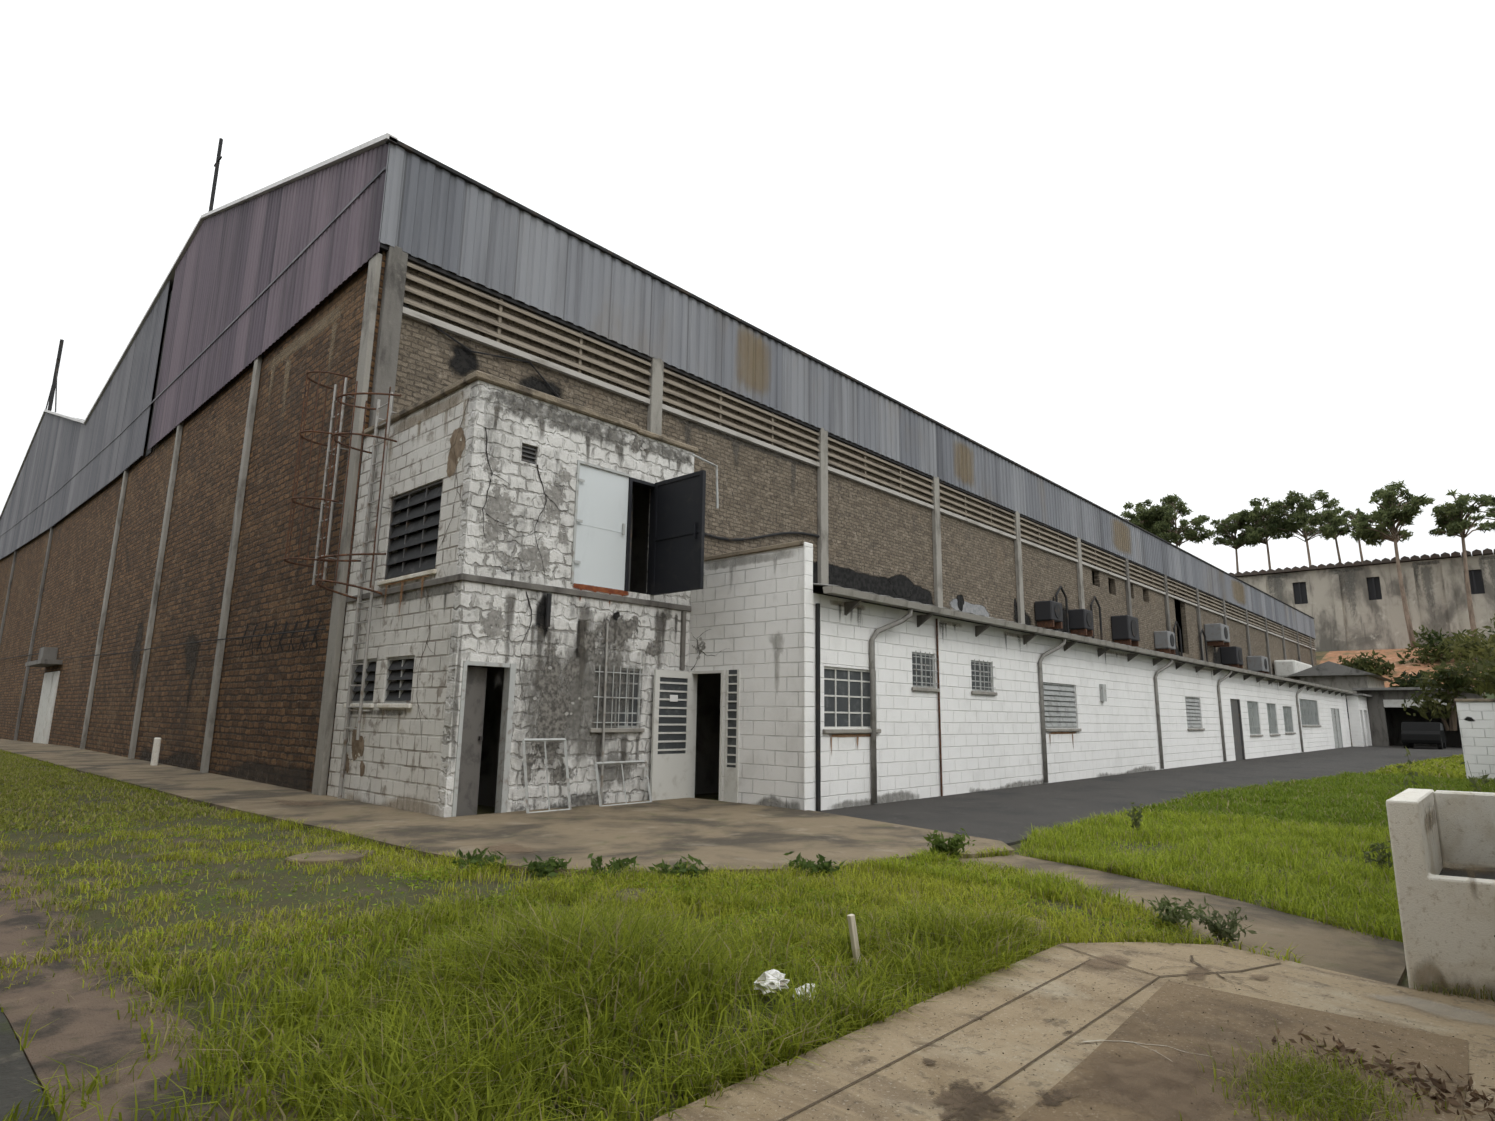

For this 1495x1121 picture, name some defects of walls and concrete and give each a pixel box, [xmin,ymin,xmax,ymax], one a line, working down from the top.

peeling [446,420,466,480]
spalling [630,435,647,456]
peeling [479,457,571,580]
peeling [468,601,509,645]
peeling [518,602,662,787]